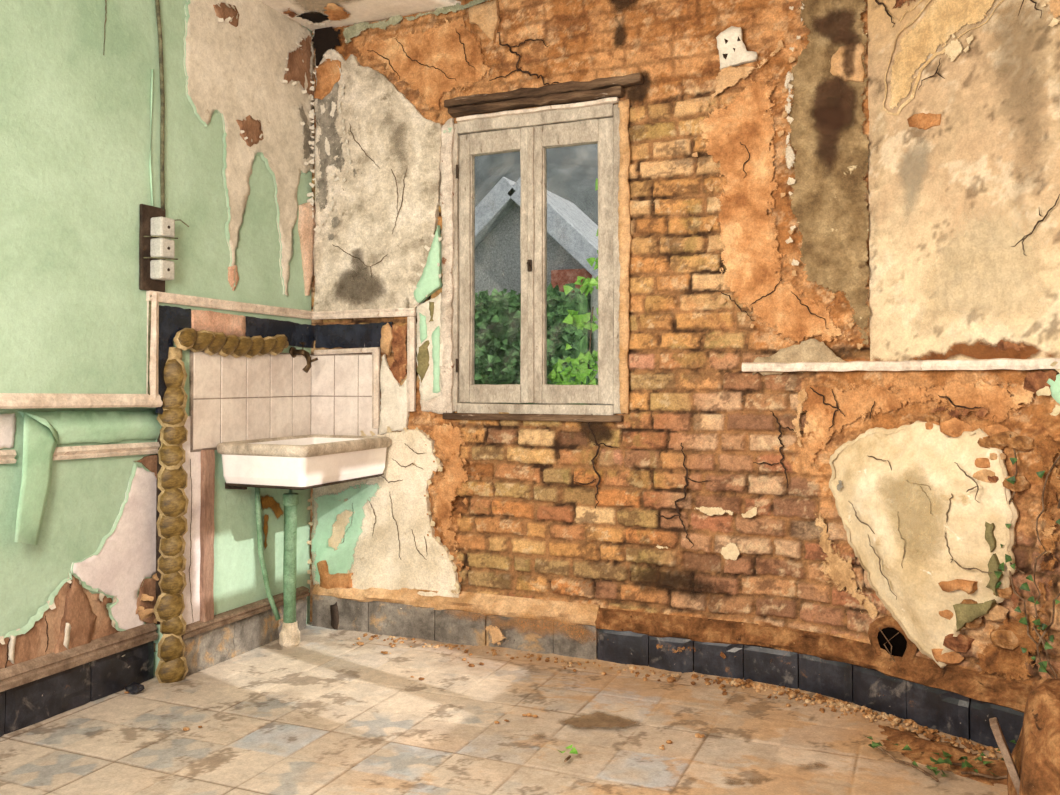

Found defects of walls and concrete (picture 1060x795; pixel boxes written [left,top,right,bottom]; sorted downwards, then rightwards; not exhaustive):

crack [489,32,559,85]
leakage [812,10,859,171]
flaking render [183,0,500,598]
leakage [335,250,382,302]
crack [1011,194,1060,256]
peeling [0,455,159,669]
peeling [182,416,201,625]
crack [574,414,619,509]
crack [655,443,709,548]
flaking render [696,506,757,518]
flaking render [720,543,740,560]
flaking render [792,361,1060,681]